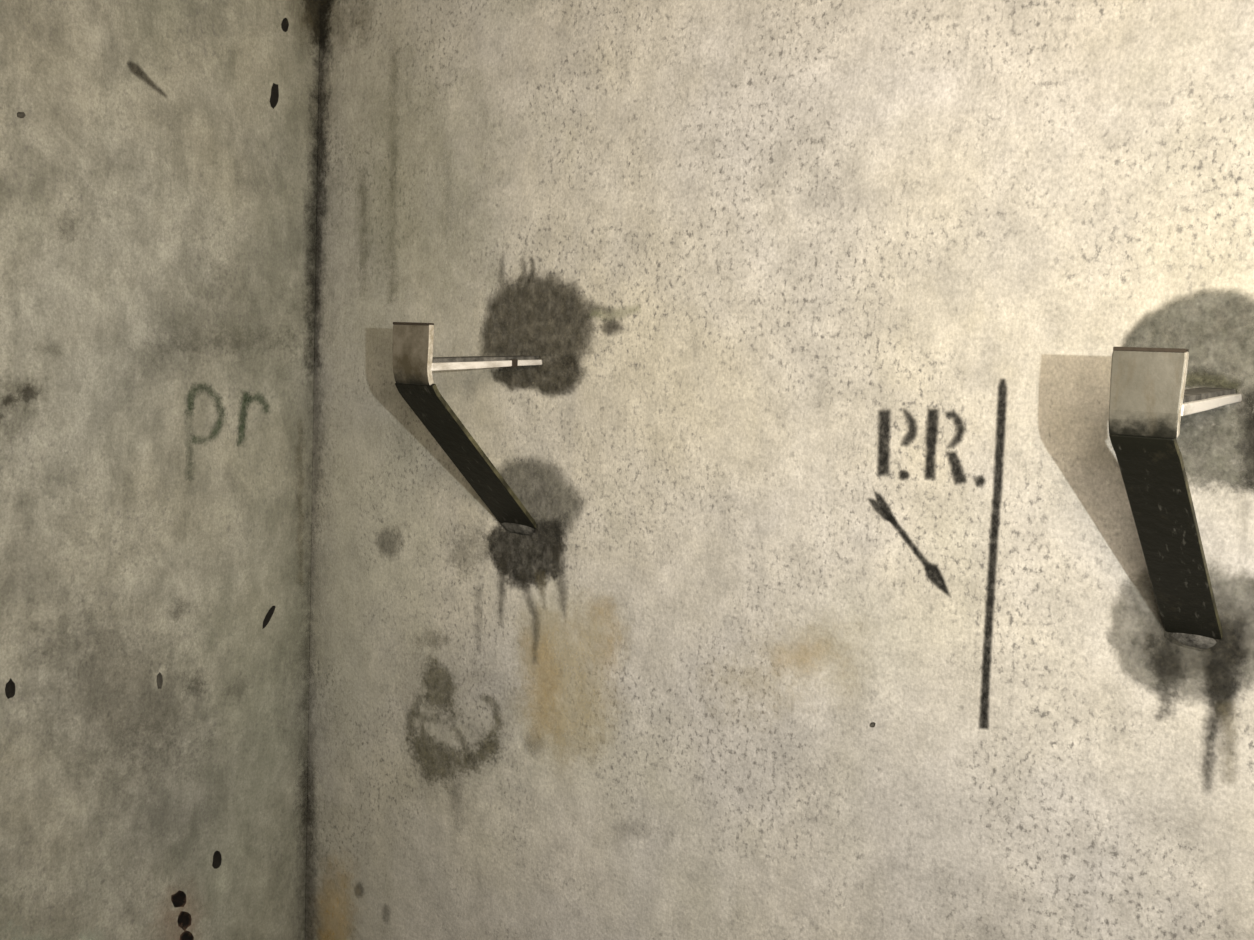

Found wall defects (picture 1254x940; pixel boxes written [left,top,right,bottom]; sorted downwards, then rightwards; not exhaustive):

leakage [305,0,333,41]
leakage [1185,373,1254,486]
leakage [424,659,454,711]
leakage [407,709,500,780]